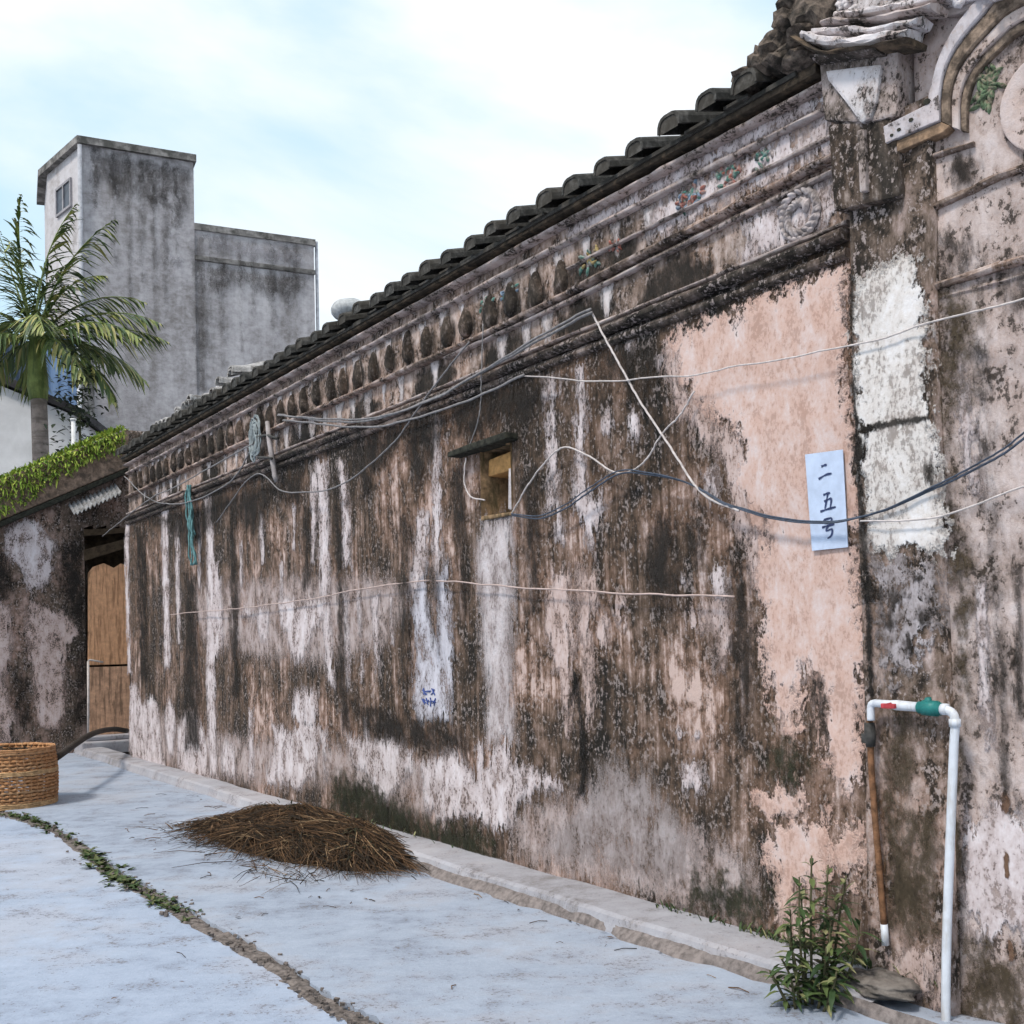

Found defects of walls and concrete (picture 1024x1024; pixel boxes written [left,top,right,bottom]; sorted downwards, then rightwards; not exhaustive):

leakage [58,533,89,725]
leakage [124,206,658,857]
leakage [644,511,705,626]
leakage [638,252,712,305]
leakage [729,540,757,748]
leakage [808,664,830,740]
leakage [937,231,991,448]
leakage [945,468,1002,795]
leakage [974,422,991,458]
leakage [993,563,1023,809]
leakage [516,790,778,935]
leakage [876,690,1024,1024]